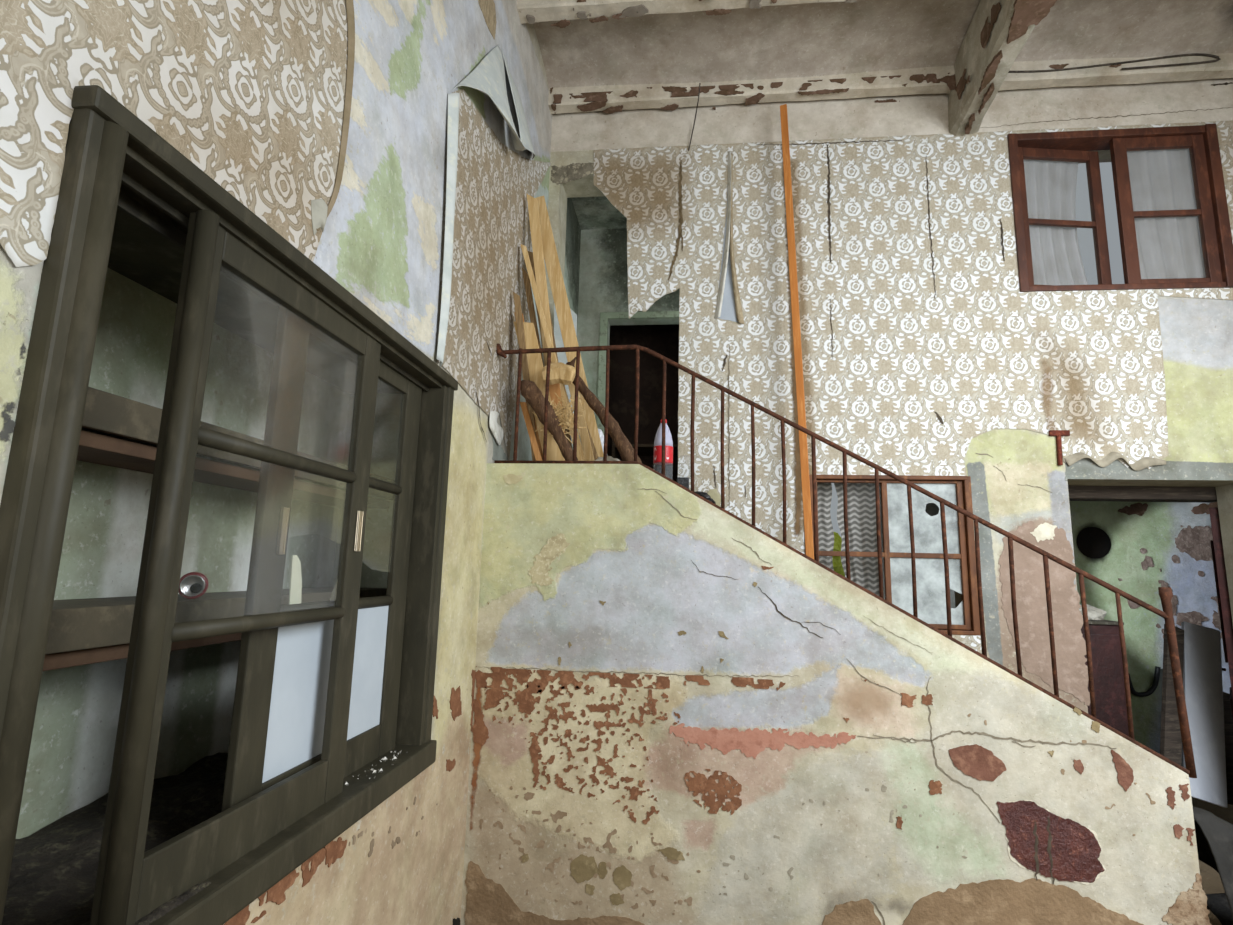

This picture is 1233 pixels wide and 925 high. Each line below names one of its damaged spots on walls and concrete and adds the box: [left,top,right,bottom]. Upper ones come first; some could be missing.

peeling [550,82,783,114]
peeling [798,78,849,95]
peeling [862,0,1057,134]
crack [642,488,697,520]
spalling [1140,502,1222,639]
crack [486,667,797,677]
peeling [731,677,786,691]
crack [693,538,1117,824]
peeling [433,642,710,925]
peeling [684,769,742,815]
peeling [224,826,401,925]
flaking render [902,800,1144,925]